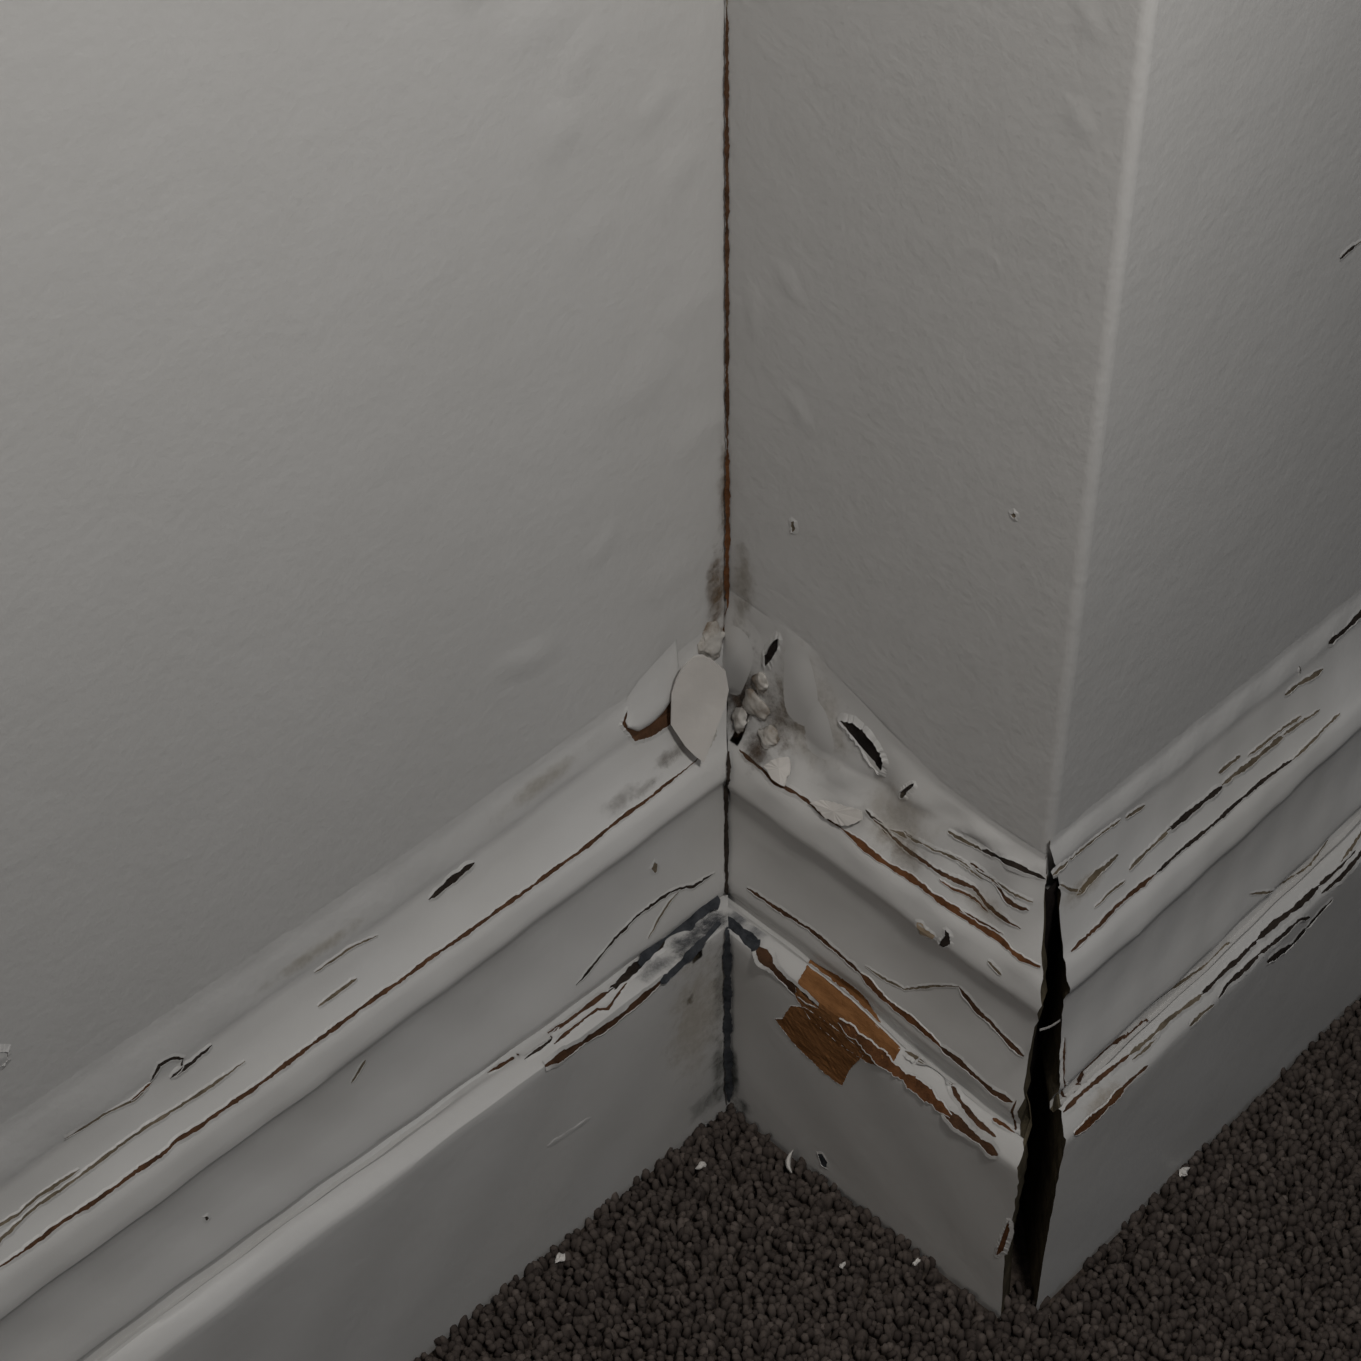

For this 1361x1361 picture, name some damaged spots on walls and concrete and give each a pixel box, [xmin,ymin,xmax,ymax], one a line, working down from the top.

flaking render [619,600,892,826]
crack [0,606,1361,1270]
peeling [774,959,903,1086]
peeling [914,919,954,950]